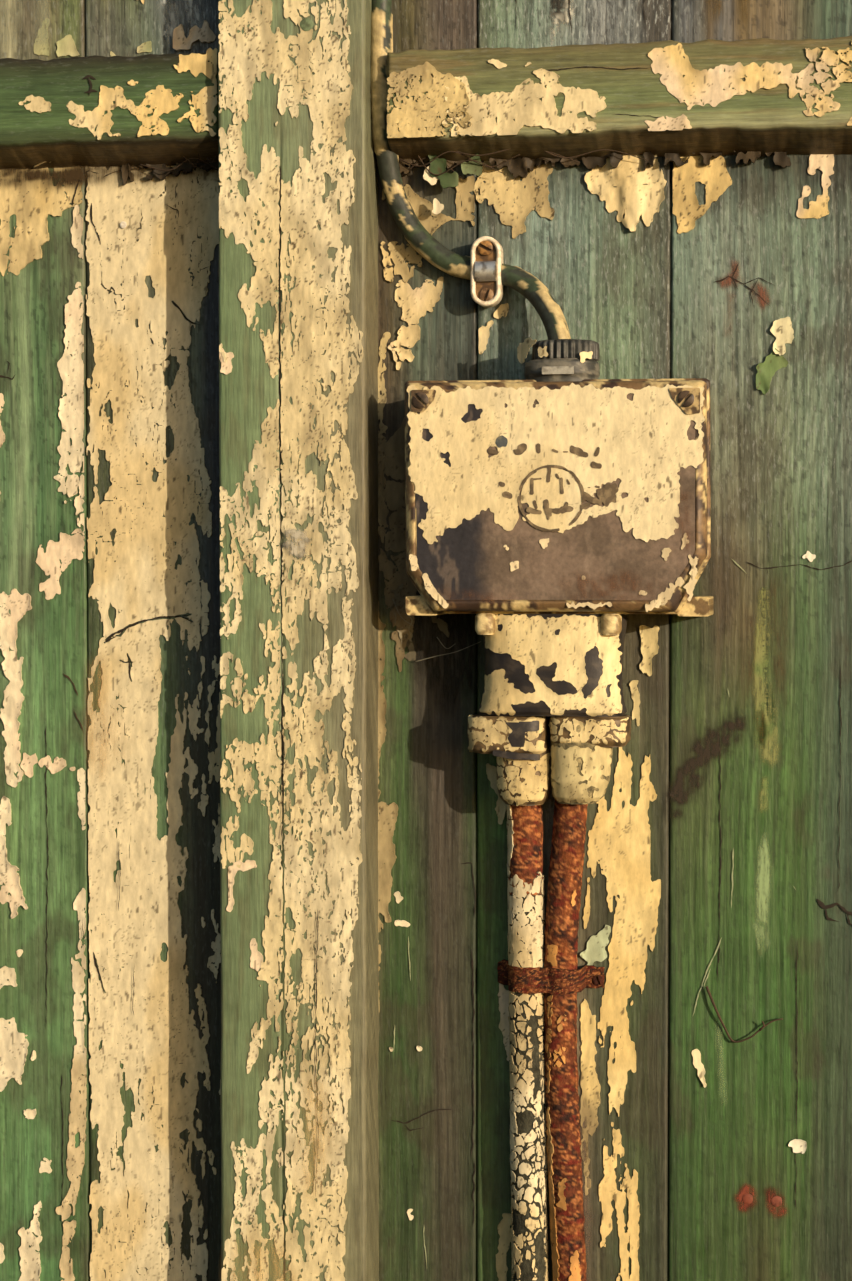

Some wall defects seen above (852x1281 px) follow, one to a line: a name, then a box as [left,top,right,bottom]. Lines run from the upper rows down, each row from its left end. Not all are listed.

peeling [644,43,852,131]
peeling [584,155,732,234]
peeling [796,154,834,219]
crack [104,614,192,680]
peeling [0,0,450,1281]
peeling [486,747,661,1281]